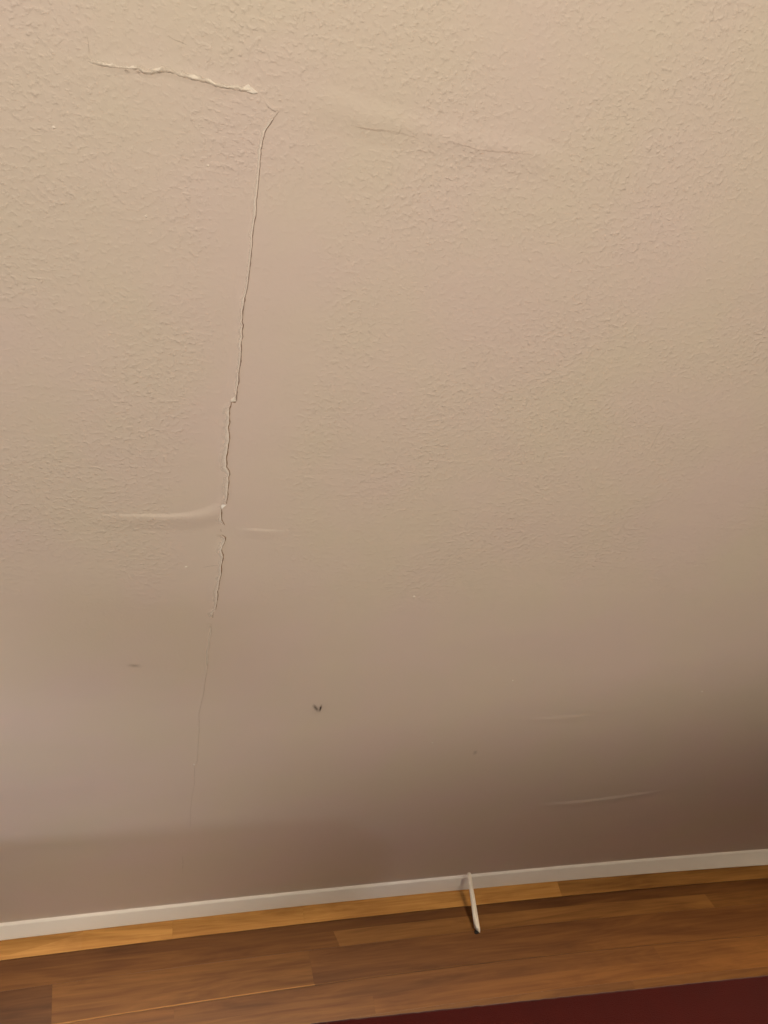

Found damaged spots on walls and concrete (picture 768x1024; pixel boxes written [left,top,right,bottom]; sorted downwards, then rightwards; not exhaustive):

flaking render [90,53,258,95]